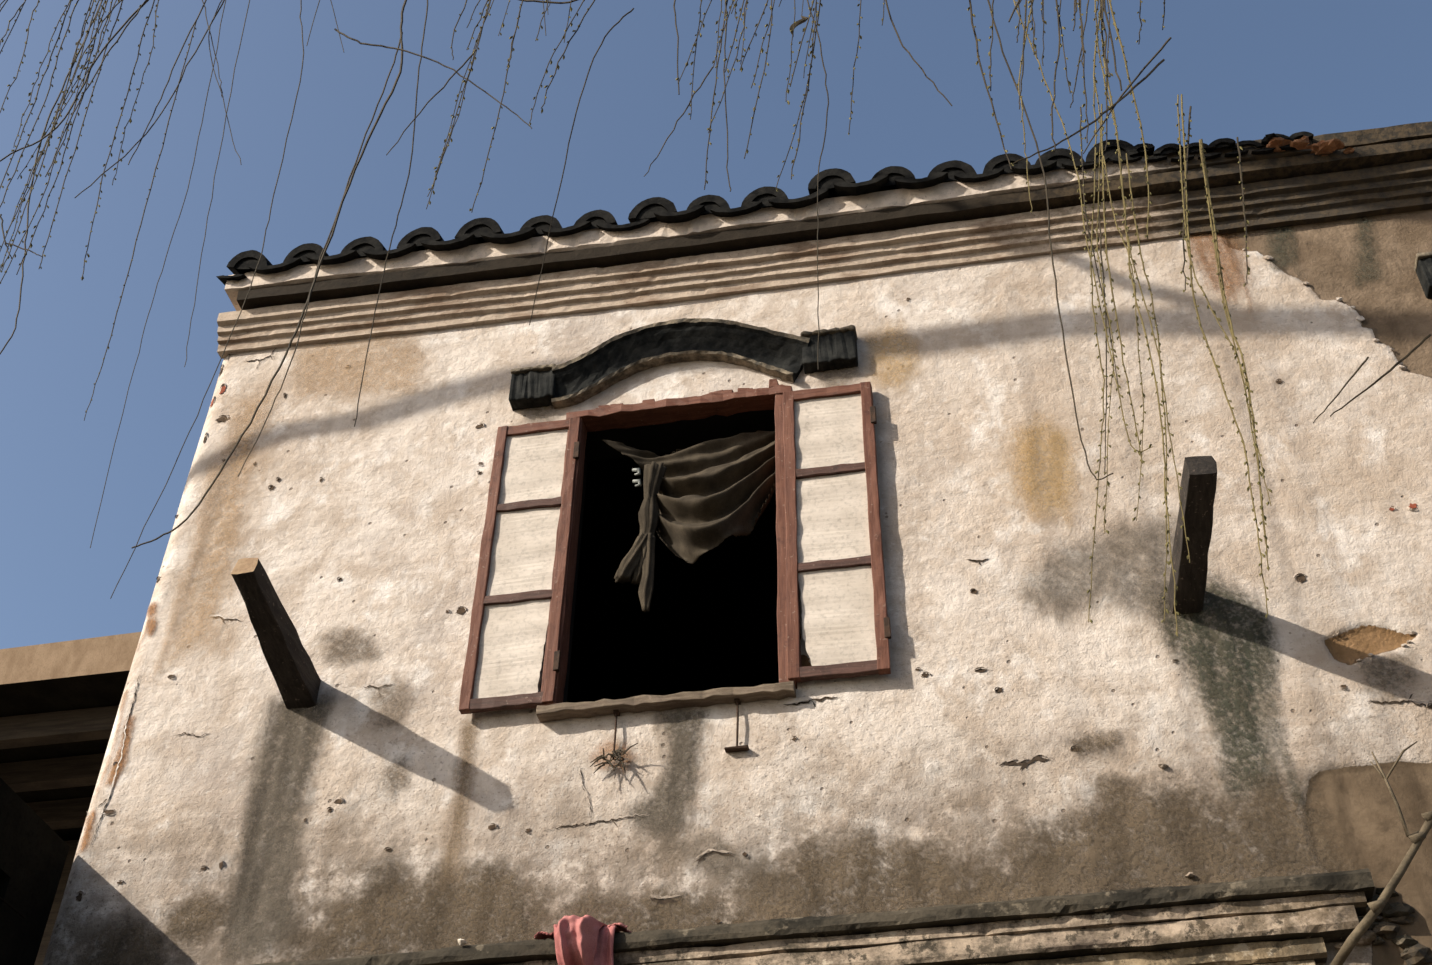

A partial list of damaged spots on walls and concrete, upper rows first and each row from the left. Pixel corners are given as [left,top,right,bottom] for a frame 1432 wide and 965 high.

spalling [1222,209,1432,378]
rust [146,603,156,635]
spalling [1325,625,1416,665]
crack [1366,694,1432,707]
crack [91,674,140,843]
leakage [84,525,1346,965]
crack [999,753,1051,770]
crack [548,766,648,830]